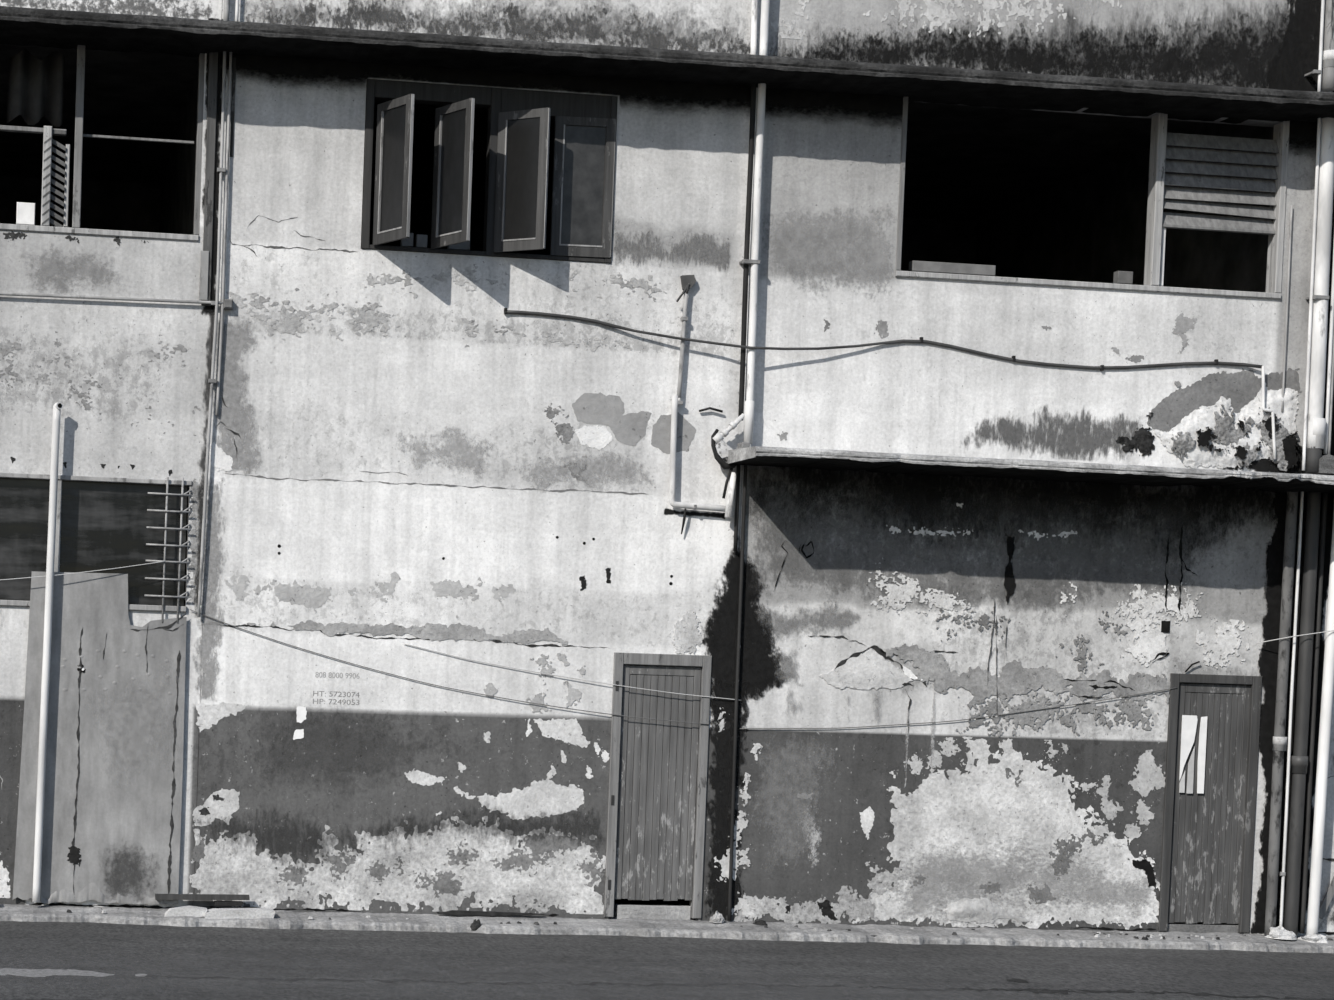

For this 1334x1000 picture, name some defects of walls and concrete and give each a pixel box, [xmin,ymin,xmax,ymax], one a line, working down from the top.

mould [1,0,223,21]
mould [246,0,750,54]
peeling [863,0,1076,37]
leakage [768,0,1321,92]
leakage [1322,189,1334,456]
peeling [651,412,696,454]
leakage [964,406,1139,460]
spalling [1116,368,1302,471]
leakage [750,442,1334,934]
peeling [189,572,609,914]
peeling [714,604,1170,930]
peeling [0,860,10,898]